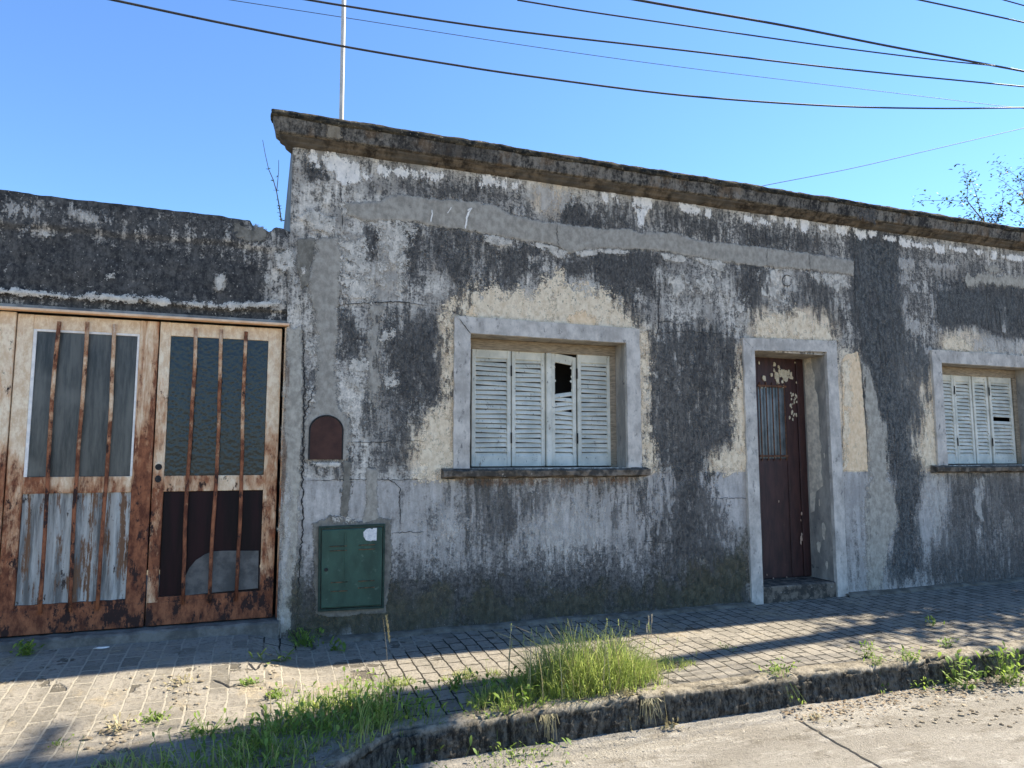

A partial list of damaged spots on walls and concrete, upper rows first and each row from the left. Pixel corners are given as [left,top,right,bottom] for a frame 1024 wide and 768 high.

crack [295,326,420,631]
water stain [304,185,1024,637]
peeling [758,358,825,544]